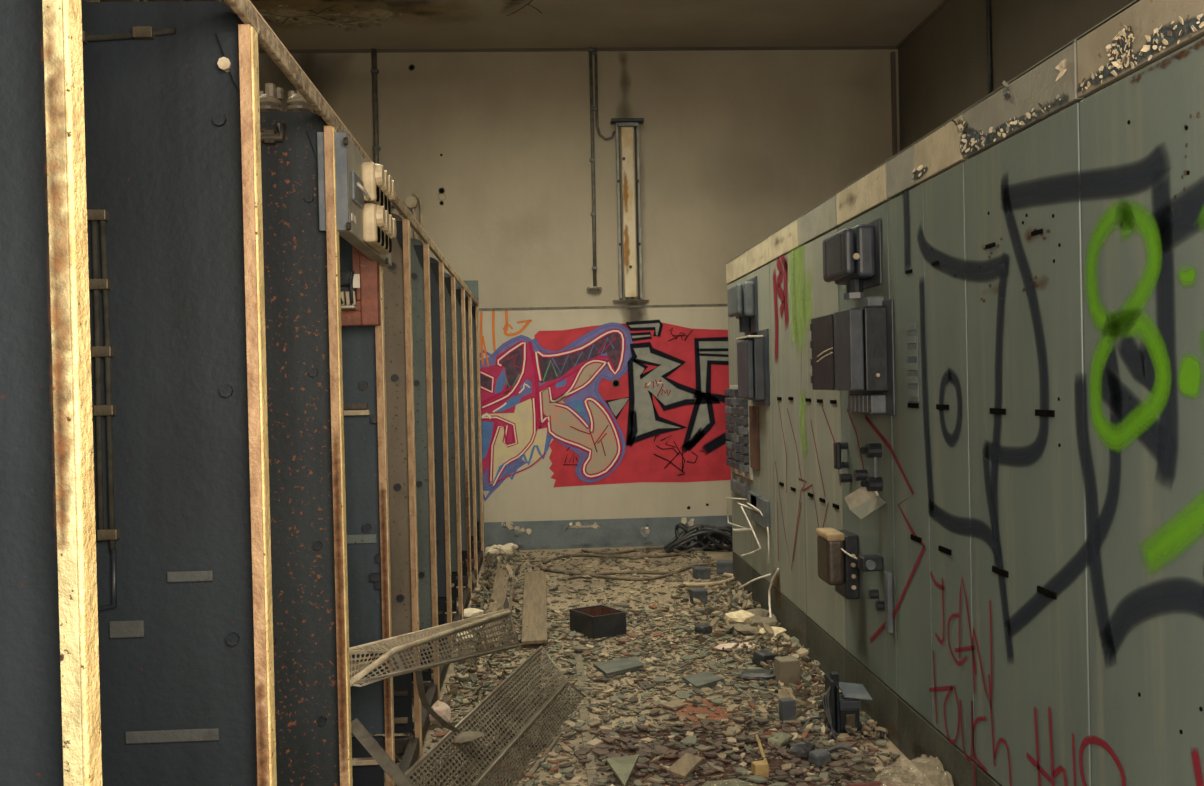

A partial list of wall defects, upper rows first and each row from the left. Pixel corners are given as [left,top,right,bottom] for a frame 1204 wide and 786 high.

water stain [250,0,441,22]
peeling [951,13,1204,155]